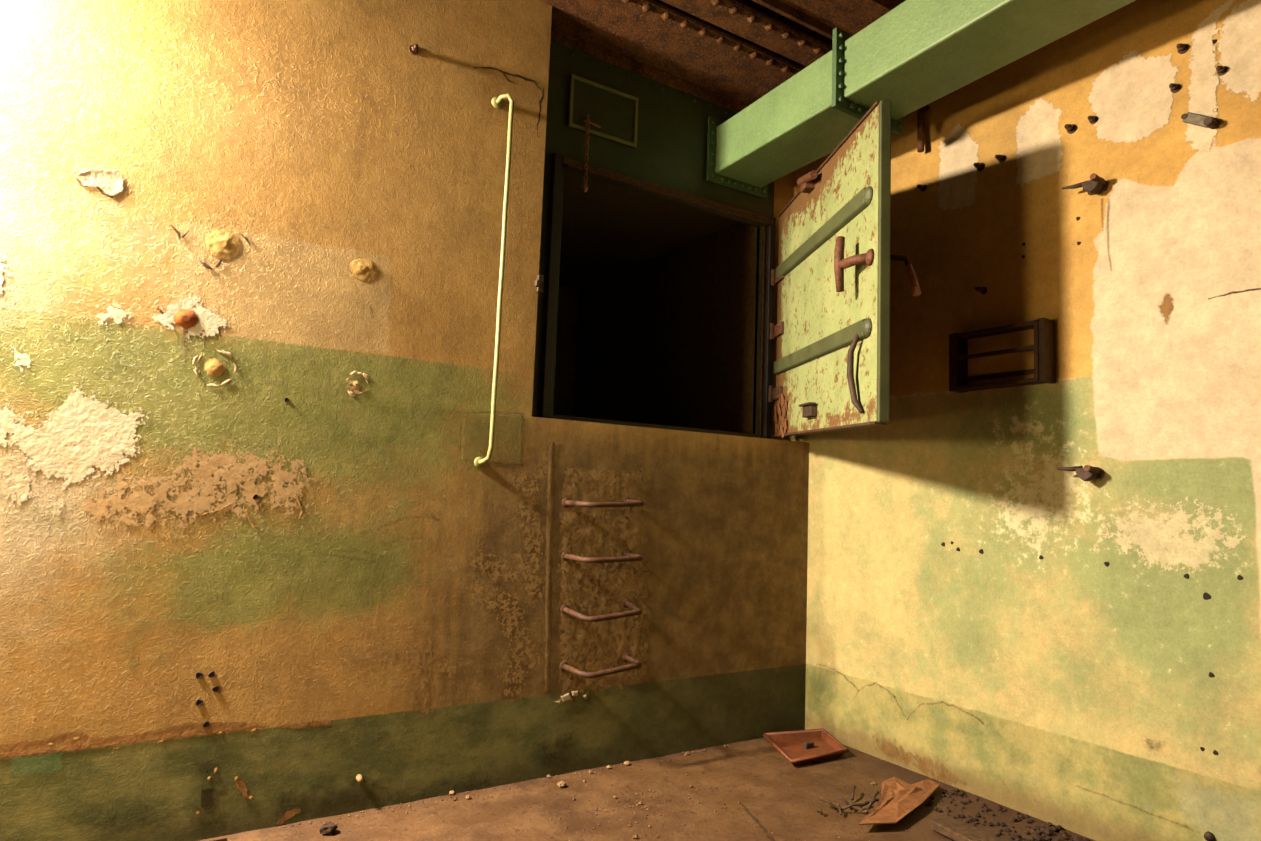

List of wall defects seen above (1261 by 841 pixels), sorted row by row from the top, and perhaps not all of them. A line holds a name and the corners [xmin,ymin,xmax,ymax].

peeling [1087,0,1261,152]
flaking render [76,168,124,198]
peeling [0,251,14,294]
crack [1208,288,1261,299]
peeling [84,300,134,327]
peeling [9,345,33,375]
peeling [0,384,323,538]